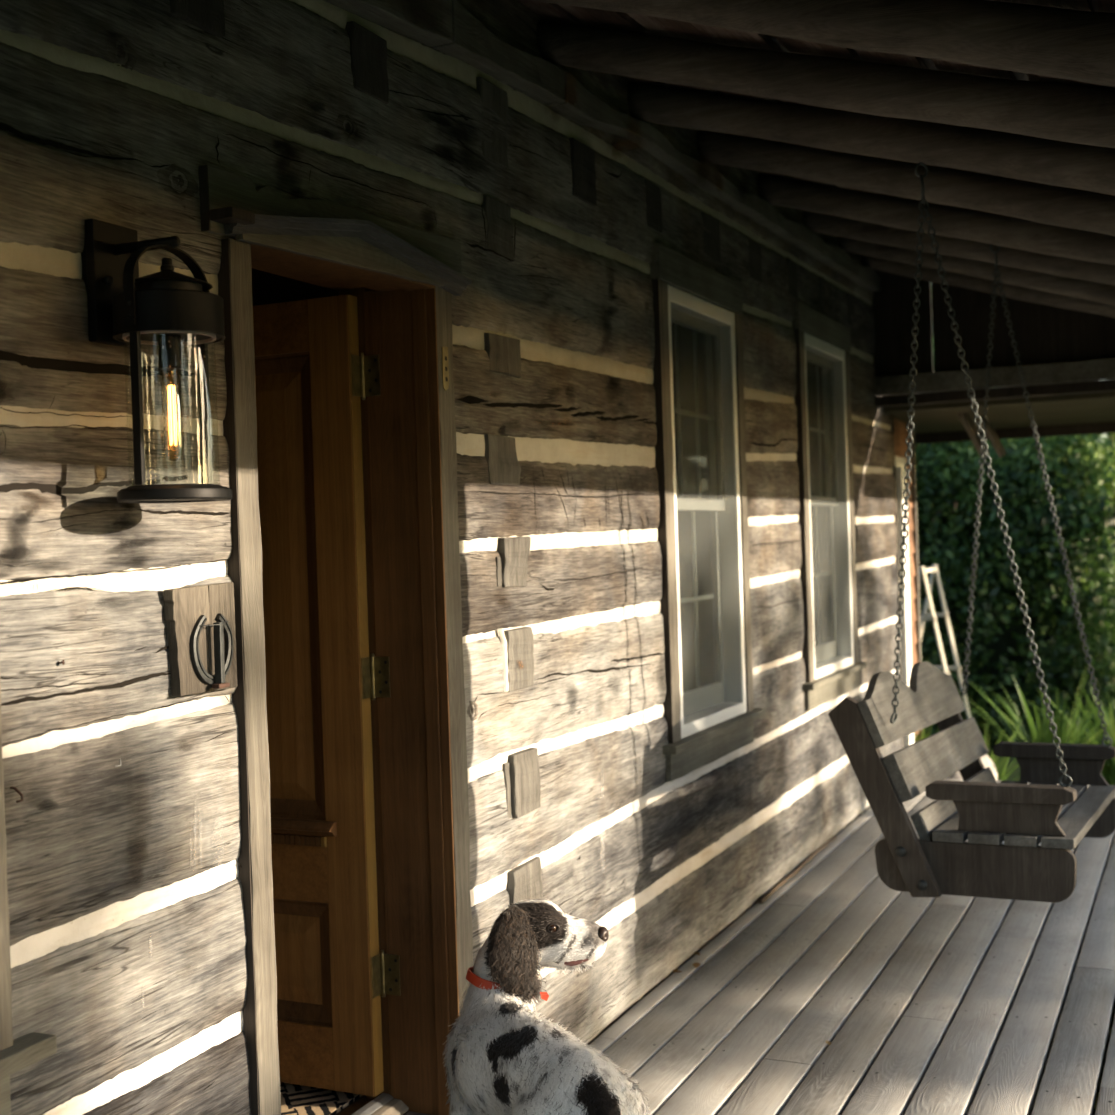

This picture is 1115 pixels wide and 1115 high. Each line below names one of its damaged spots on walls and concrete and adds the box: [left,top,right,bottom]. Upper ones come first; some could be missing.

crack [0,122,174,168]
crack [0,350,195,454]
crack [457,396,657,424]
crack [0,475,229,534]
crack [0,627,233,744]